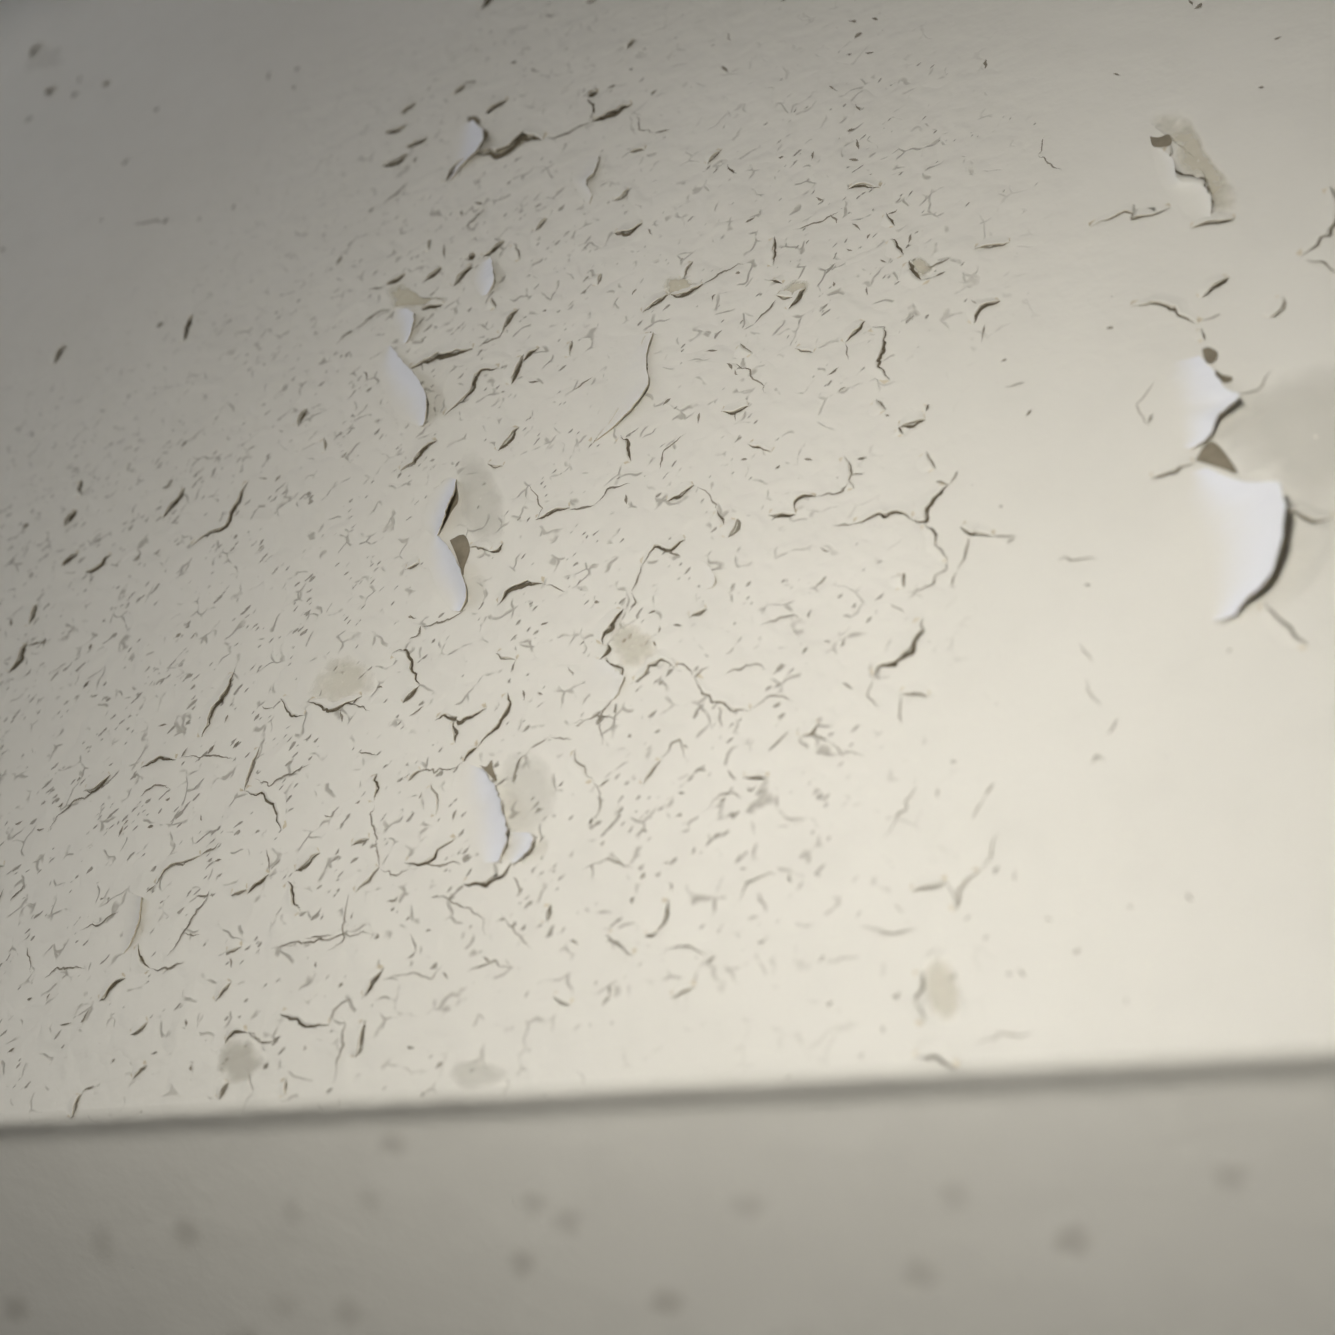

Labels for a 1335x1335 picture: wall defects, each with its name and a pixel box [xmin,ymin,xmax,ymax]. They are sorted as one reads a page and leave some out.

peeling [1151,146,1212,219]
peeling [377,290,438,426]
crack [341,209,548,339]
crack [399,298,591,471]
crack [640,175,1010,452]
peeling [1164,356,1240,449]
peeling [423,477,467,612]
crack [469,538,564,604]
crack [513,319,1014,821]
peeling [1182,468,1286,622]
crack [27,611,552,1082]
peeling [460,763,534,864]